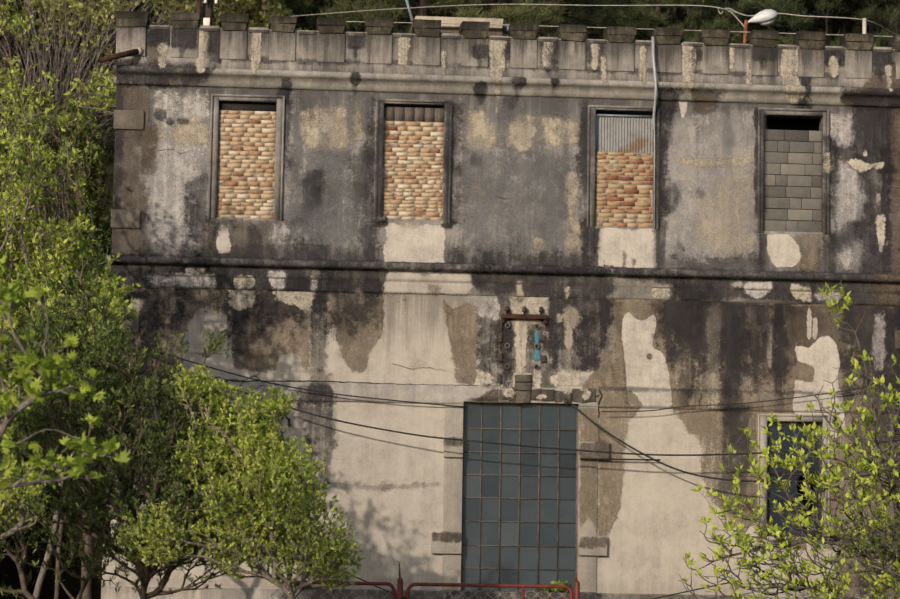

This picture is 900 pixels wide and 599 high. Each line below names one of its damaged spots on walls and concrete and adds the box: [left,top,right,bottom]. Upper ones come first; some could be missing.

damp [115,28,222,110]
peeling [847,150,885,172]
peeling [216,225,231,254]
peeling [381,222,474,296]
peeling [597,228,657,268]
peeling [767,234,801,268]
peeling [875,214,886,252]
damp [111,33,900,560]
peeling [734,281,773,299]
peeling [622,312,672,407]
peeling [790,284,846,438]
damp [825,544,899,599]